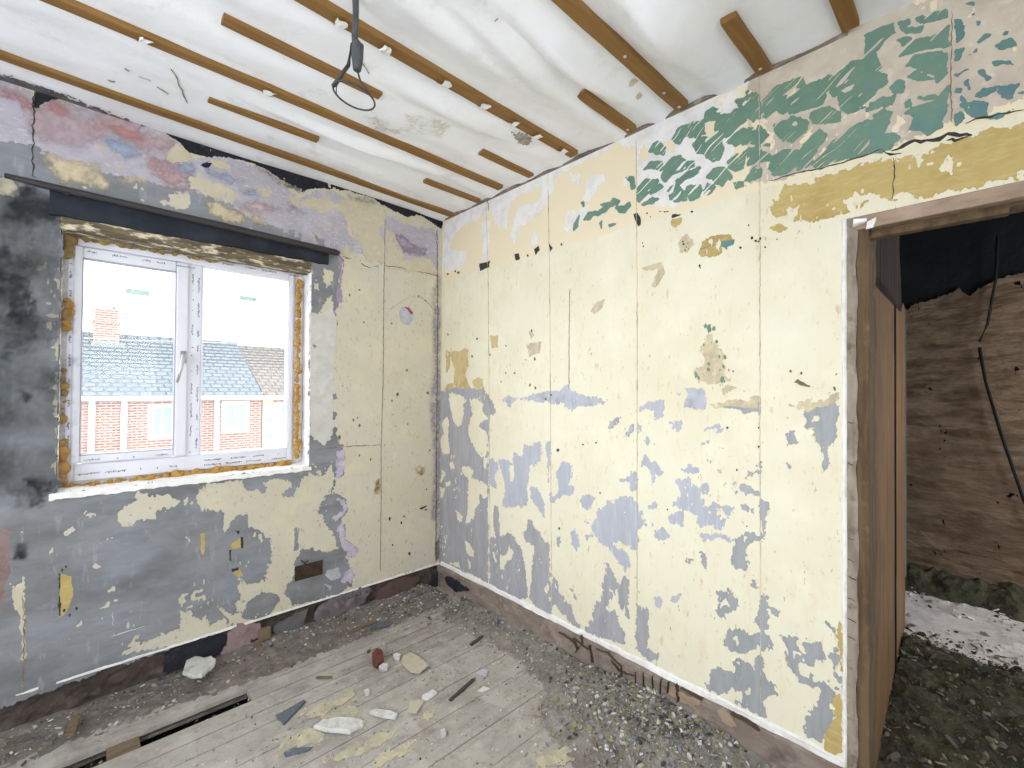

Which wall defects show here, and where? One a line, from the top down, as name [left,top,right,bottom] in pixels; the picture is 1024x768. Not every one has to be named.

crack [29,92,37,178]
flaking render [0,0,1024,275]
water stain [0,246,30,307]
crack [730,11,1023,732]
peeling [0,194,345,709]
peeling [284,479,371,621]
flaking render [373,576,419,601]
peeling [426,373,842,743]
flaking render [421,689,438,701]